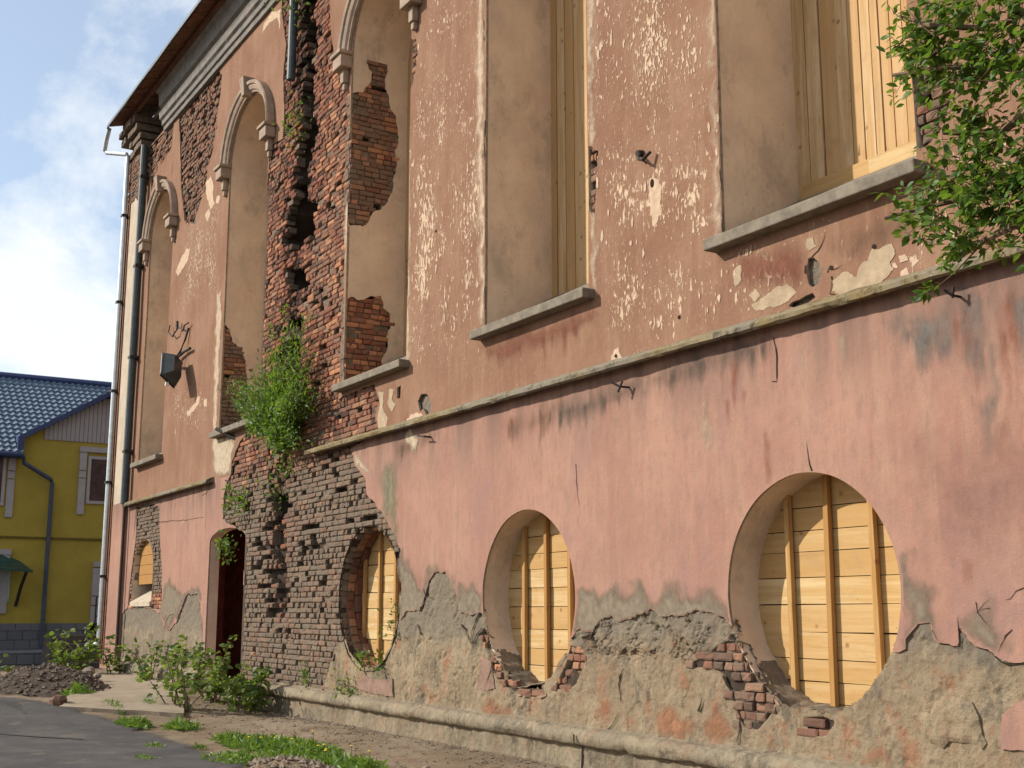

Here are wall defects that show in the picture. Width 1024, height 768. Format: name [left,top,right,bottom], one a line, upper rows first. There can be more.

flaking render [127,71,253,446]
flaking render [212,0,1024,768]
flaking render [120,502,203,670]
crack [932,587,1024,665]